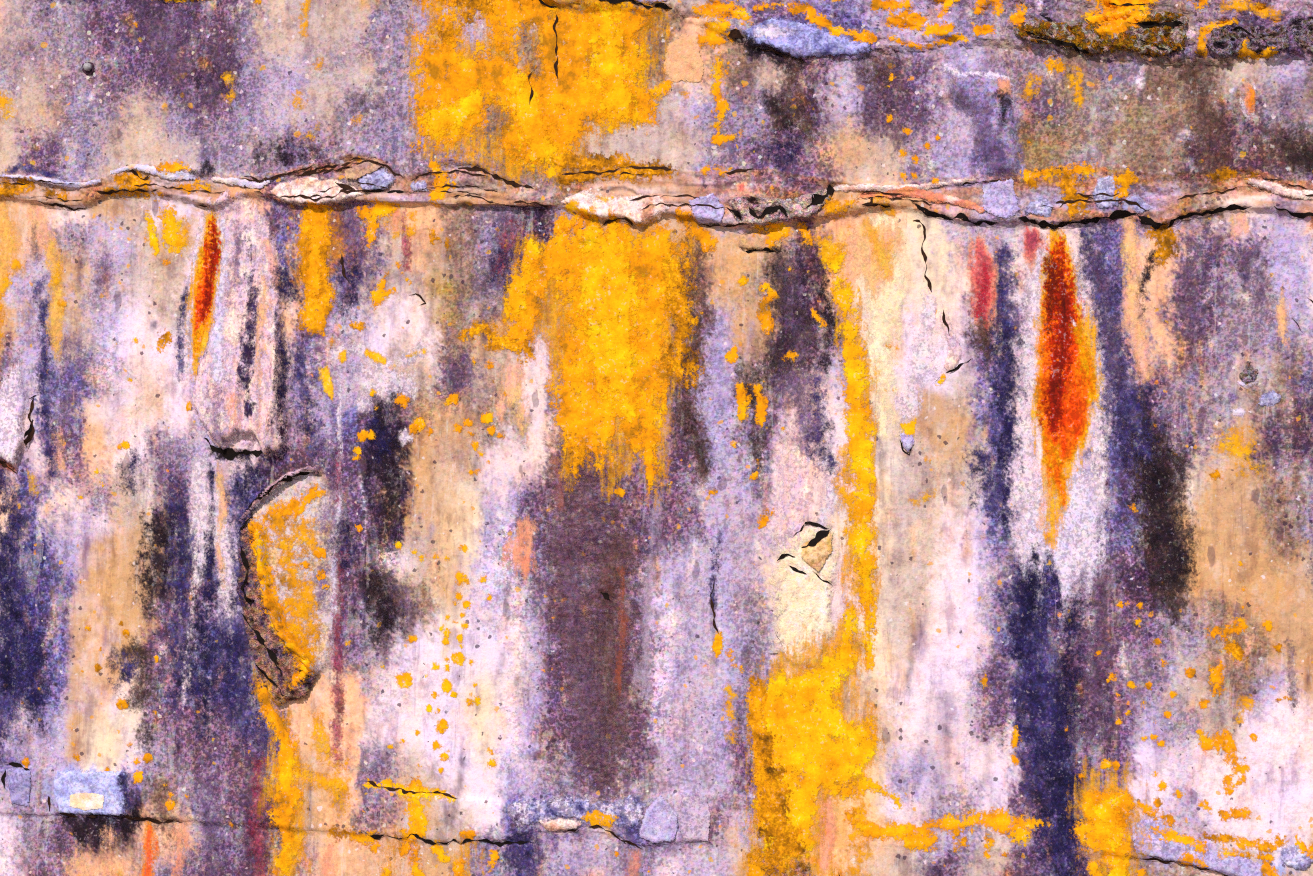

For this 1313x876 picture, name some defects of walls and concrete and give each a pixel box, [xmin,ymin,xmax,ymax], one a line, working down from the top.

crack [0,157,548,211]
peeling [730,18,870,73]
water stain [1178,53,1228,175]
water stain [1269,124,1313,178]
corrosion [187,211,225,380]
crack [562,166,1313,381]
corrosion [968,235,999,346]
corrosion [1024,225,1102,549]
flaking render [236,466,342,705]
flaking render [769,525,839,664]
water stain [966,227,1196,876]
crack [1134,857,1228,876]